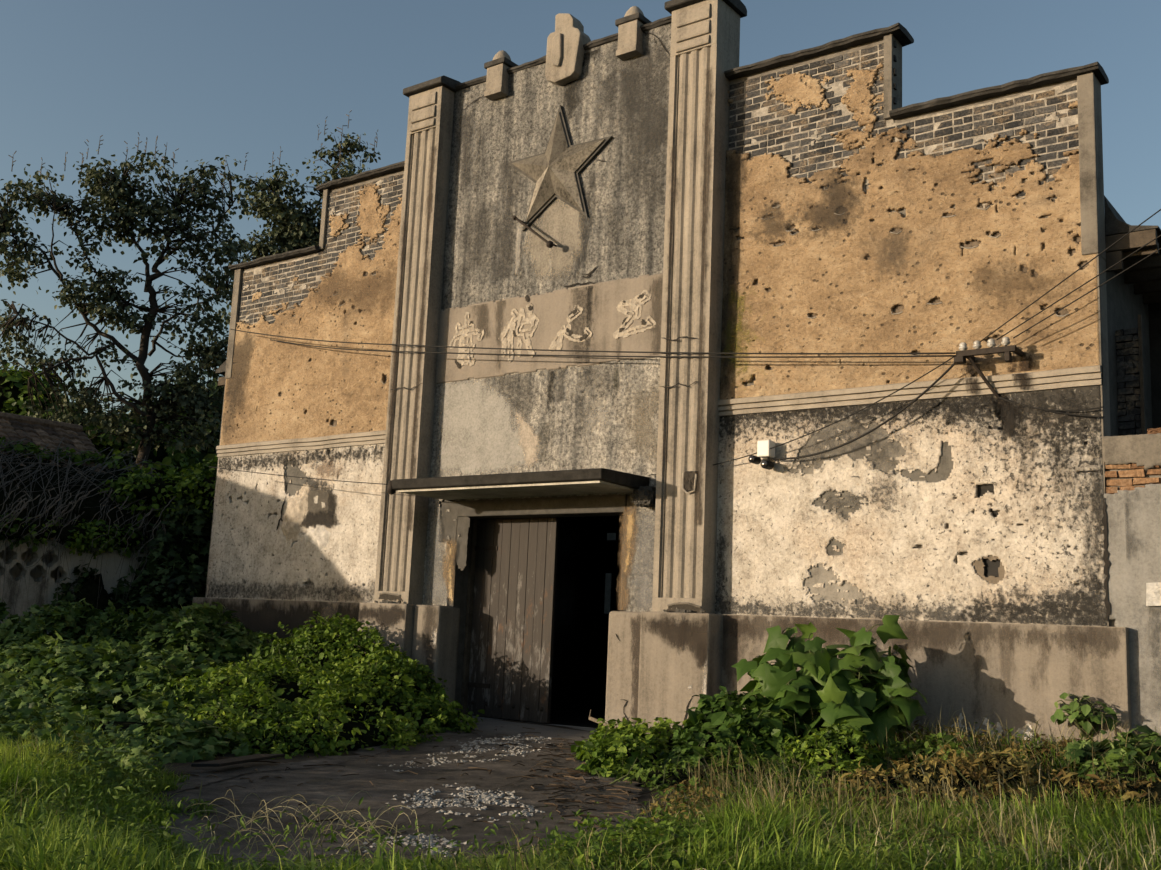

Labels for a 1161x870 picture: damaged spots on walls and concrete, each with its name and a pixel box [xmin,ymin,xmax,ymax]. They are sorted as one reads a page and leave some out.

peeling [238,173,404,329]
damp [652,215,672,355]
damp [694,70,712,525]
damp [720,153,749,394]
damp [754,169,859,237]
peeling [729,40,1079,232]
damp [200,579,405,651]
peeling [803,537,865,608]
peeling [812,489,869,520]
peeling [788,417,954,486]
damp [631,387,1118,725]
spalling [972,555,1005,584]